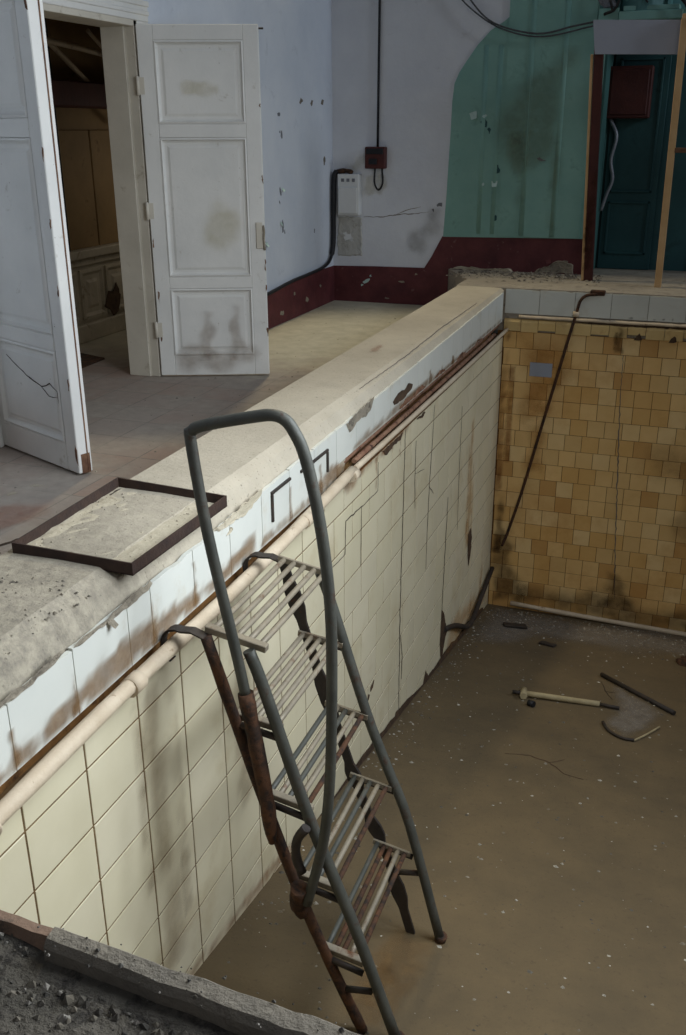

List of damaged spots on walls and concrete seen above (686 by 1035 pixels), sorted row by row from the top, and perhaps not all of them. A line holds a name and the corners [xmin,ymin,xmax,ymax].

spalling [346,397,374,433]